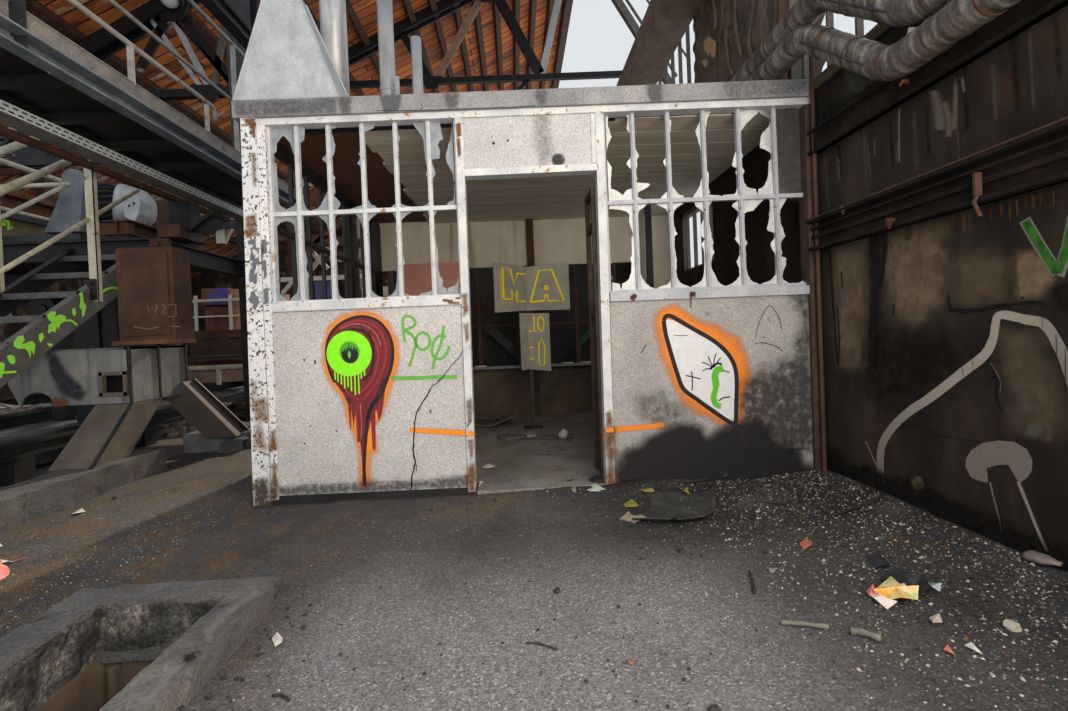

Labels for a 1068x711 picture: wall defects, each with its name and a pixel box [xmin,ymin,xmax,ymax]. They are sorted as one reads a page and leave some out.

rust [244,118,255,137]
rust [805,116,1068,222]
rust [246,215,263,263]
crack [410,351,463,490]
rust [604,412,617,484]